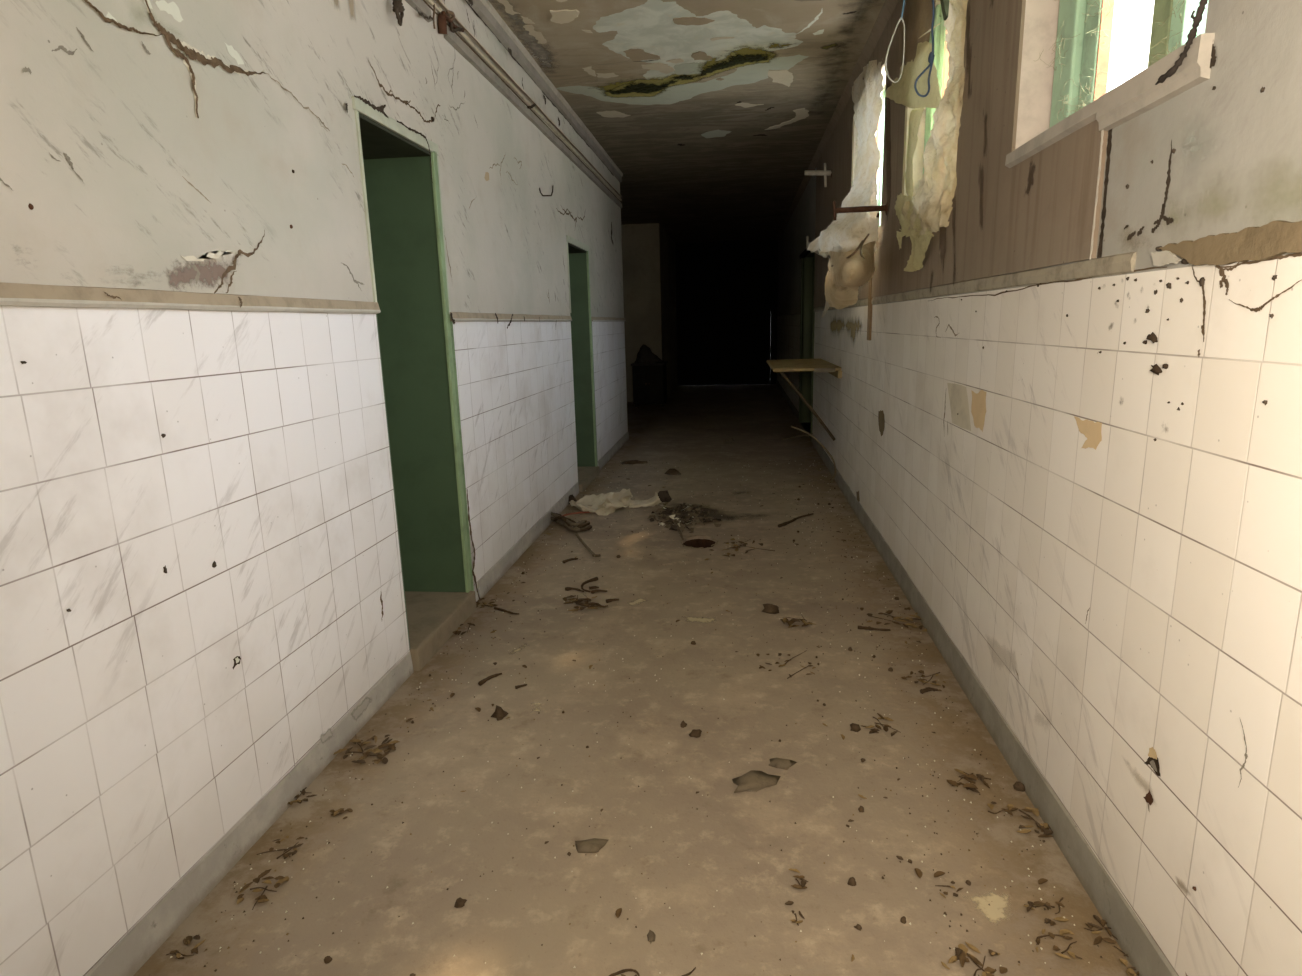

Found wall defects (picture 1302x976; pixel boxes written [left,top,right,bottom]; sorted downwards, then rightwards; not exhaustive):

peeling [497,0,824,118]
crack [1209,44,1217,68]
crack [22,0,614,185]
peeling [765,108,809,130]
crack [931,129,1301,357]
spalling [1151,220,1302,268]
peeling [947,383,986,432]
peeling [1074,416,1102,450]